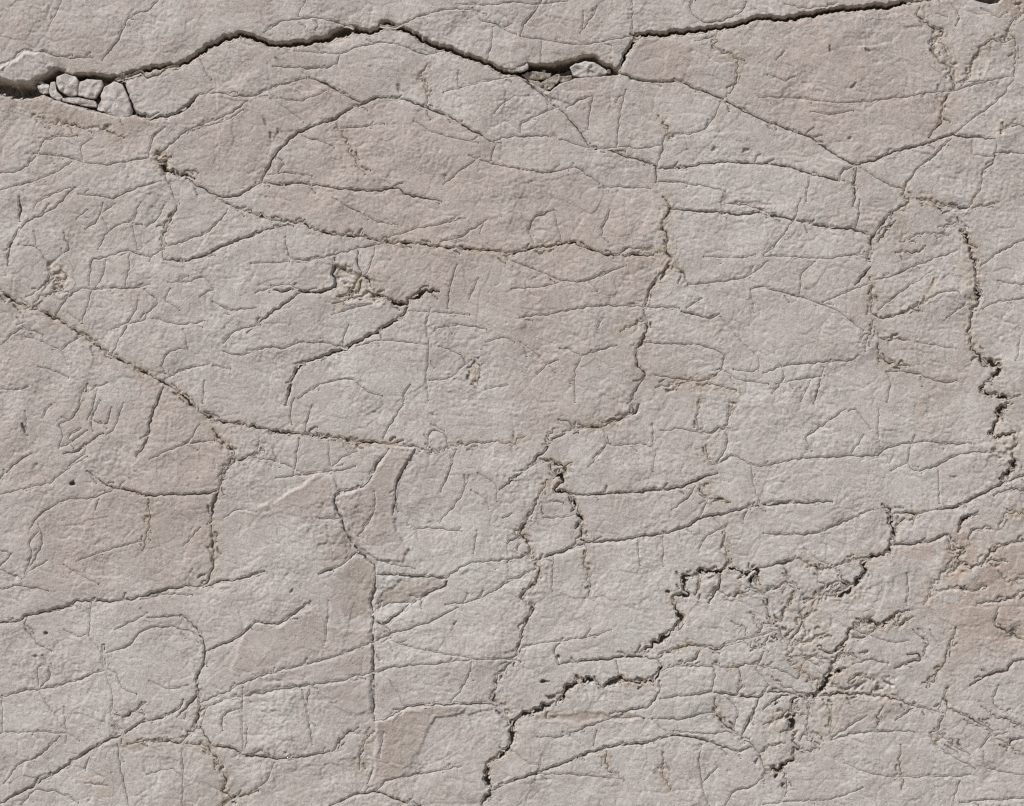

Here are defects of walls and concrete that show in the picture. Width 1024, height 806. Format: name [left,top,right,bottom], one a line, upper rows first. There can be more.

crack [759,4,1024,138]
crack [224,285,487,405]
crack [749,249,972,331]
crack [938,218,1024,512]
crack [0,382,125,496]
crack [0,424,355,744]
crack [923,535,1024,605]
crack [0,694,198,806]
crack [128,689,258,806]
crack [193,688,330,793]
crack [509,720,751,784]
crack [653,607,975,806]